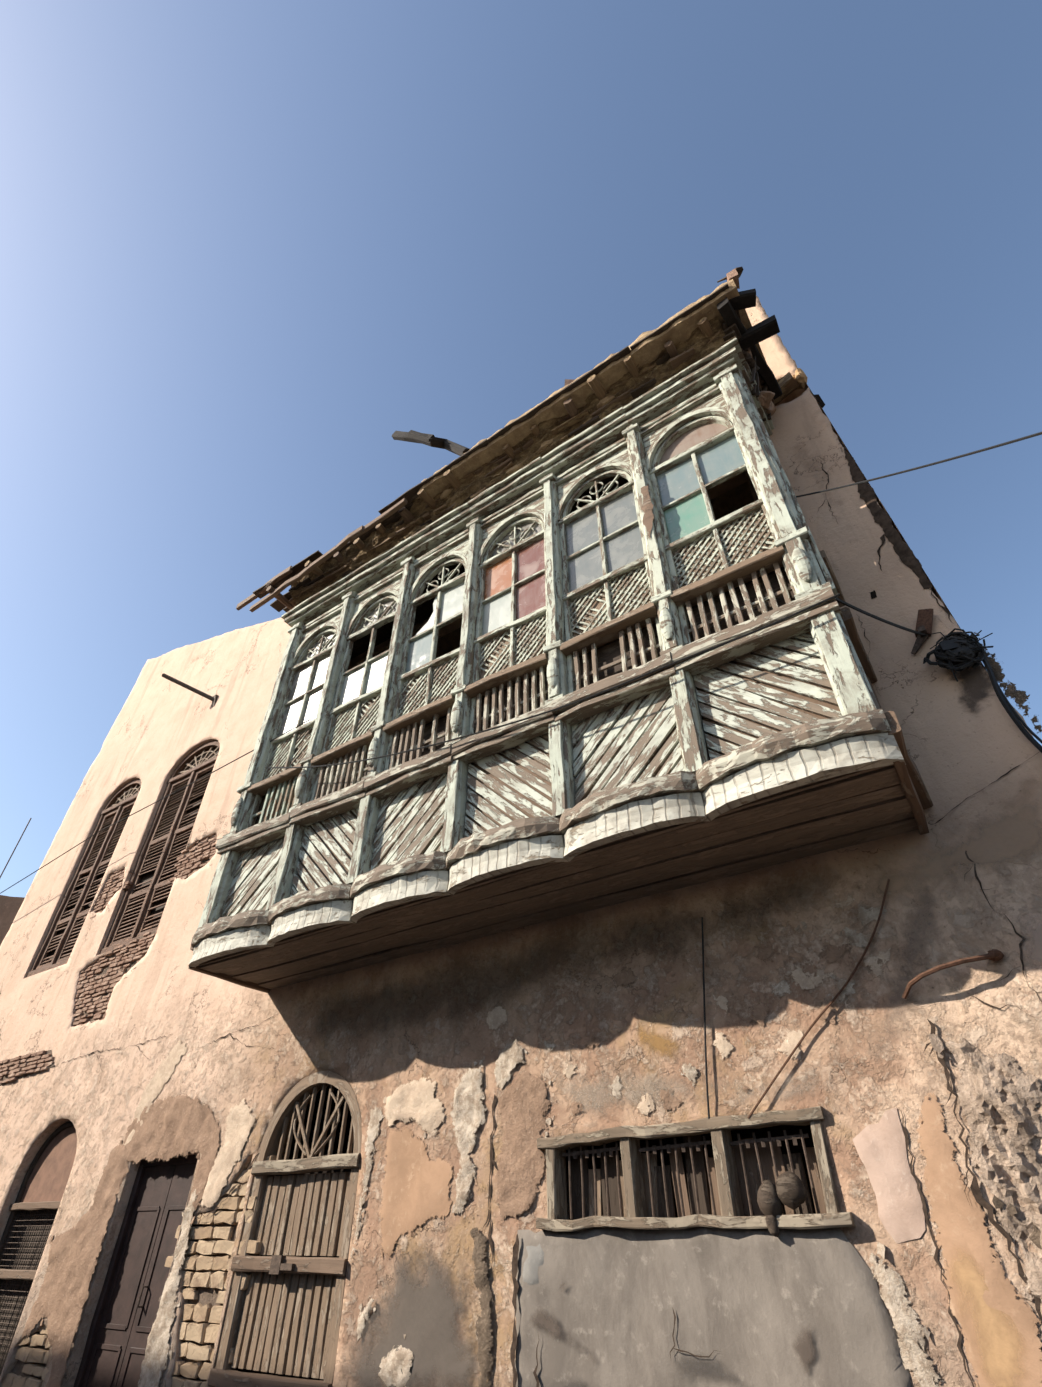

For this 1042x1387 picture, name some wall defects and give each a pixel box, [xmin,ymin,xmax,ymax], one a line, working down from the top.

crack [818,449,951,621]
crack [964,851,1042,1020]
flaking render [1,1094,277,1387]
peeling [356,1298,377,1341]
peeling [378,1334,414,1387]
peeling [349,1006,527,1262]
peeling [470,1227,497,1387]
crack [901,1111,974,1387]
crack [922,1019,1042,1322]